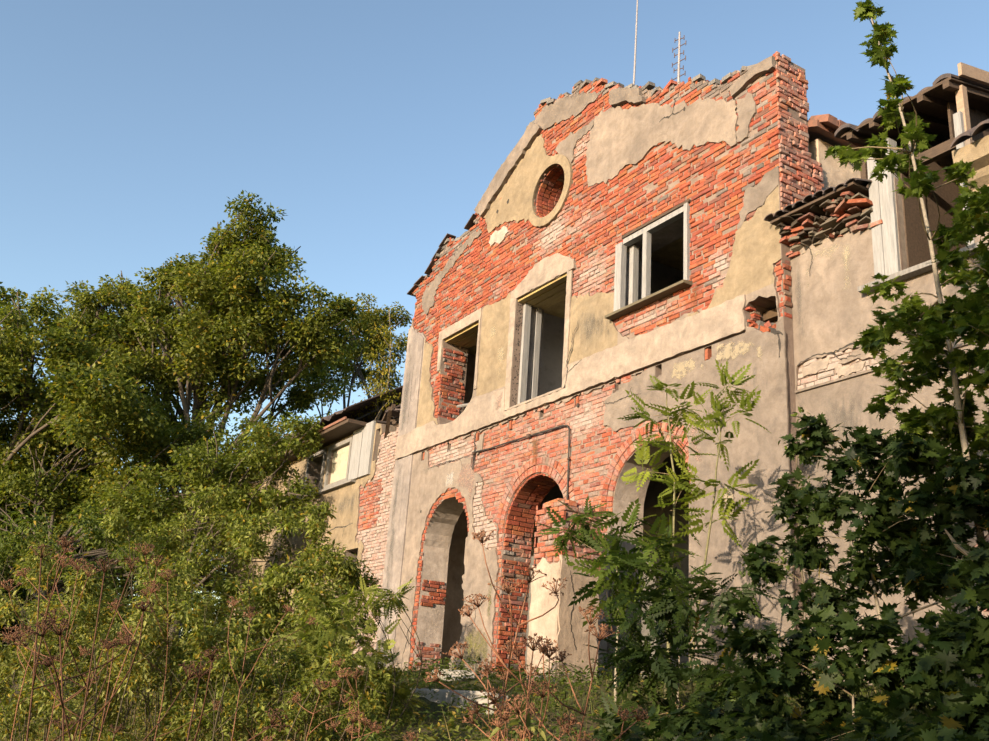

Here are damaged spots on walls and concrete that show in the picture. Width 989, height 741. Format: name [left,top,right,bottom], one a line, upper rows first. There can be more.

flaking render [411,51,824,418]
flaking render [797,348,879,390]
flaking render [353,427,399,669]
flaking render [409,374,693,673]